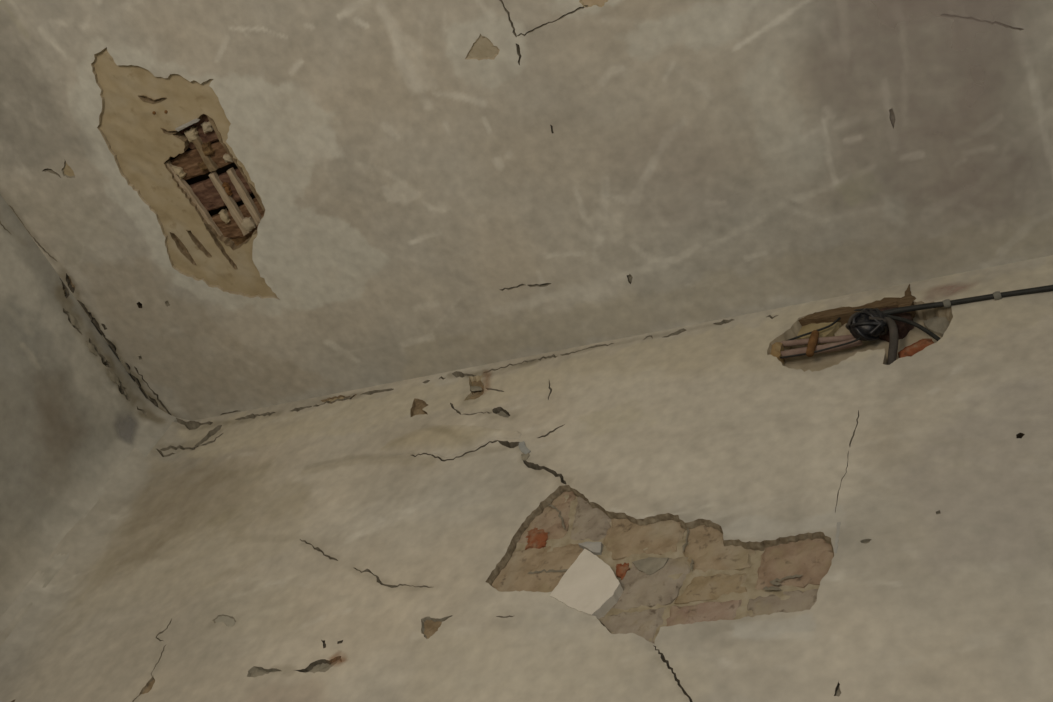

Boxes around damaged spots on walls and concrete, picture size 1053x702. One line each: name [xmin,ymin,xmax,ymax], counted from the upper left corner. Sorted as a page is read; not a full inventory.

spalling [465,34,500,60]
crack [499,0,588,65]
spalling [91,47,279,299]
spalling [767,297,953,372]
spalling [410,398,428,417]
crack [411,424,566,484]
crack [300,539,431,588]
spalling [486,485,834,644]
spalling [421,615,453,639]
spalling [247,640,343,677]
crack [653,645,693,702]